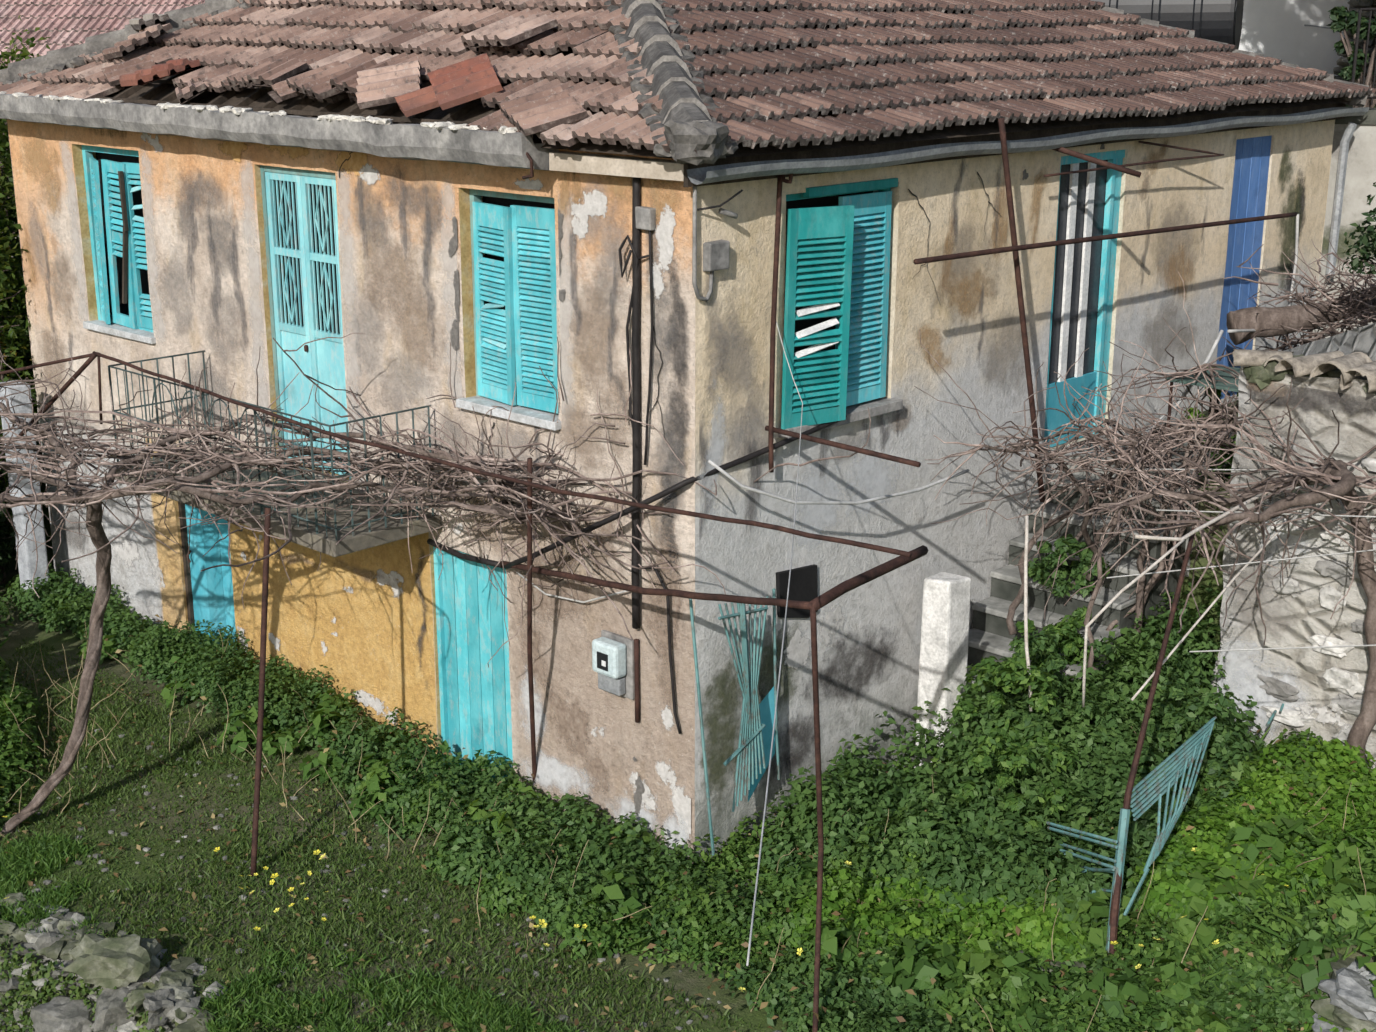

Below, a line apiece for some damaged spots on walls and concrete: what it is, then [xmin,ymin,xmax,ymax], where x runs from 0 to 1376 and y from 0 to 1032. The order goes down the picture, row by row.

peeling [514,178,543,190]
leakage [180,175,245,339]
leakage [357,178,440,309]
peeling [558,190,607,302]
peeling [649,204,676,300]
peeling [376,569,404,598]
leakage [758,635,795,704]
leakage [819,639,890,700]
spalling [661,705,673,731]
leakage [702,662,741,789]
leakage [765,718,815,781]
spalling [629,761,691,840]